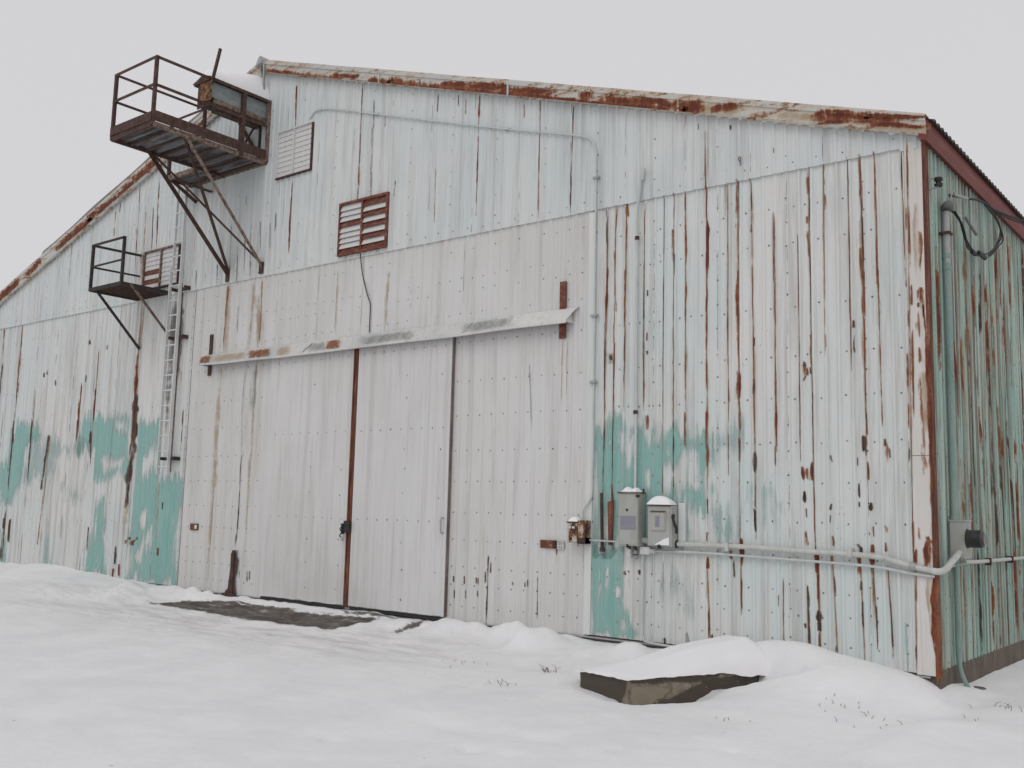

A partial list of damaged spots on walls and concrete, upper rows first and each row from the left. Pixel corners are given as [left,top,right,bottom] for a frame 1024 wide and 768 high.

peeling [0,412,183,585]
rust [55,160,160,282]
rust [112,311,144,577]
rust [265,69,738,204]
peeling [592,414,744,639]
rust [662,193,687,493]
rust [725,179,757,532]
rust [797,165,838,653]
rust [847,152,883,482]
rust [858,526,888,657]
rust [888,571,942,685]
rust [901,144,1024,643]